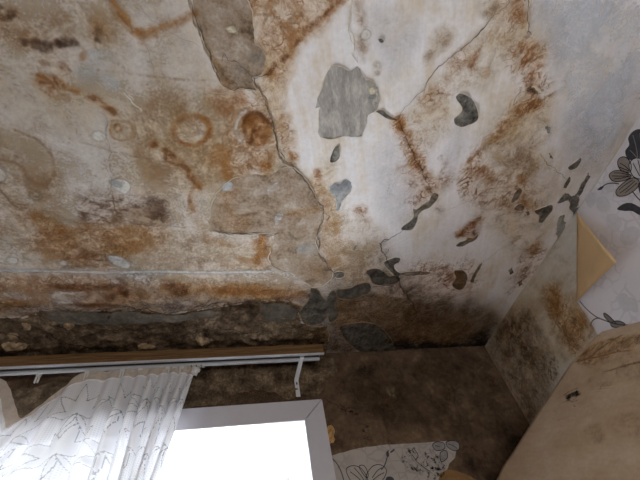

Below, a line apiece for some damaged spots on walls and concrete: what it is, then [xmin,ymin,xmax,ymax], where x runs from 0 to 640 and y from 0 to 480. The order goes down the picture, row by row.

flaking render [193,0,266,91]
rust [32,196,169,267]
crack [141,0,336,285]
water stain [0,0,557,418]
peeling [315,65,395,163]
rust [393,115,450,205]
crack [394,6,507,193]
peeling [454,93,479,127]
rust [461,37,552,212]
peeling [510,158,590,250]
spalling [0,167,430,409]
spalling [11,380,70,418]